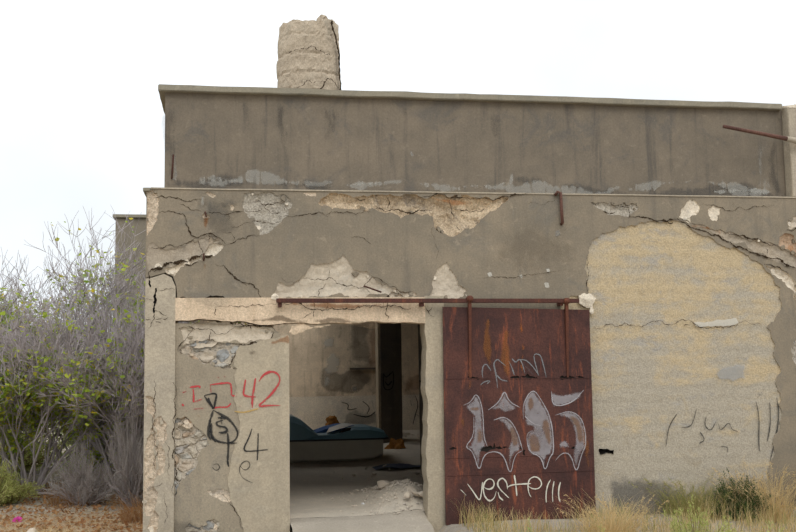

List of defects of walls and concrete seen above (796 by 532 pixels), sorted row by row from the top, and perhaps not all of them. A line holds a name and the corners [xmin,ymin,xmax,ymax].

spalling [230,192,293,235]
spalling [304,193,509,237]
spalling [275,255,417,298]
crack [146,193,557,366]
spalling [429,263,467,299]
spalling [178,321,273,369]
flaking render [560,199,796,517]
crack [597,319,764,329]
crack [147,383,178,521]
spalling [142,396,209,532]